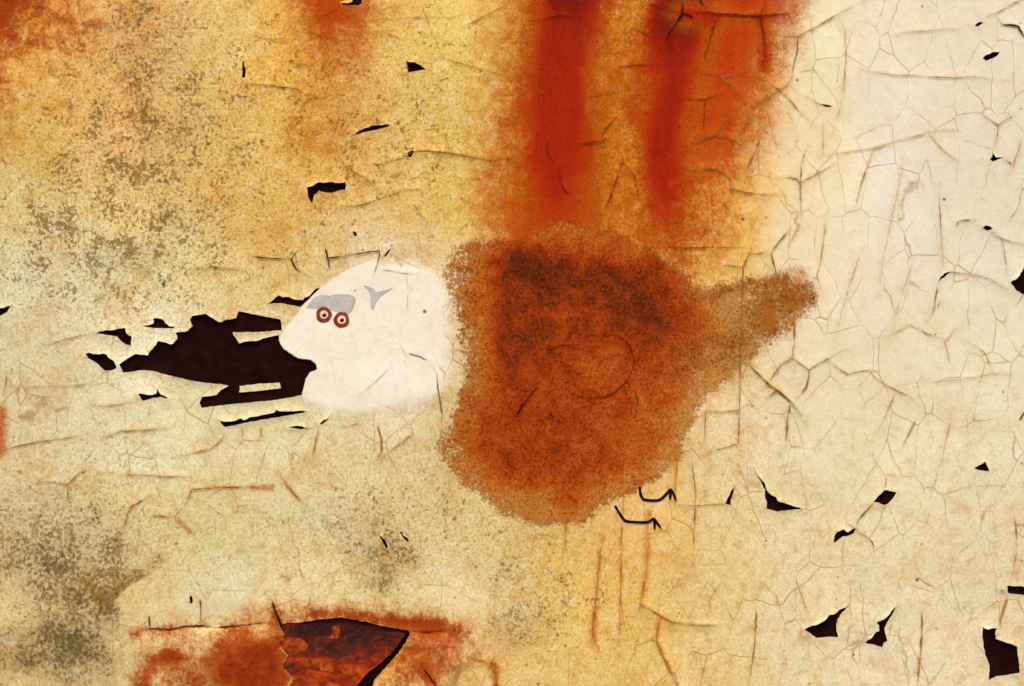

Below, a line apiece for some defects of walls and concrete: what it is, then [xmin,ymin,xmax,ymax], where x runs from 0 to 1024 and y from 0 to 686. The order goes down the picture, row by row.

rust [0,0,108,82]
rust [292,0,376,71]
crack [997,1,1024,36]
crack [634,0,847,195]
rust [435,0,817,527]
peeling [86,311,317,429]
crack [672,232,869,449]
rust [130,601,480,686]
peeling [804,606,848,638]
peeling [865,607,896,647]
crack [916,614,924,678]
peeling [982,626,1020,680]